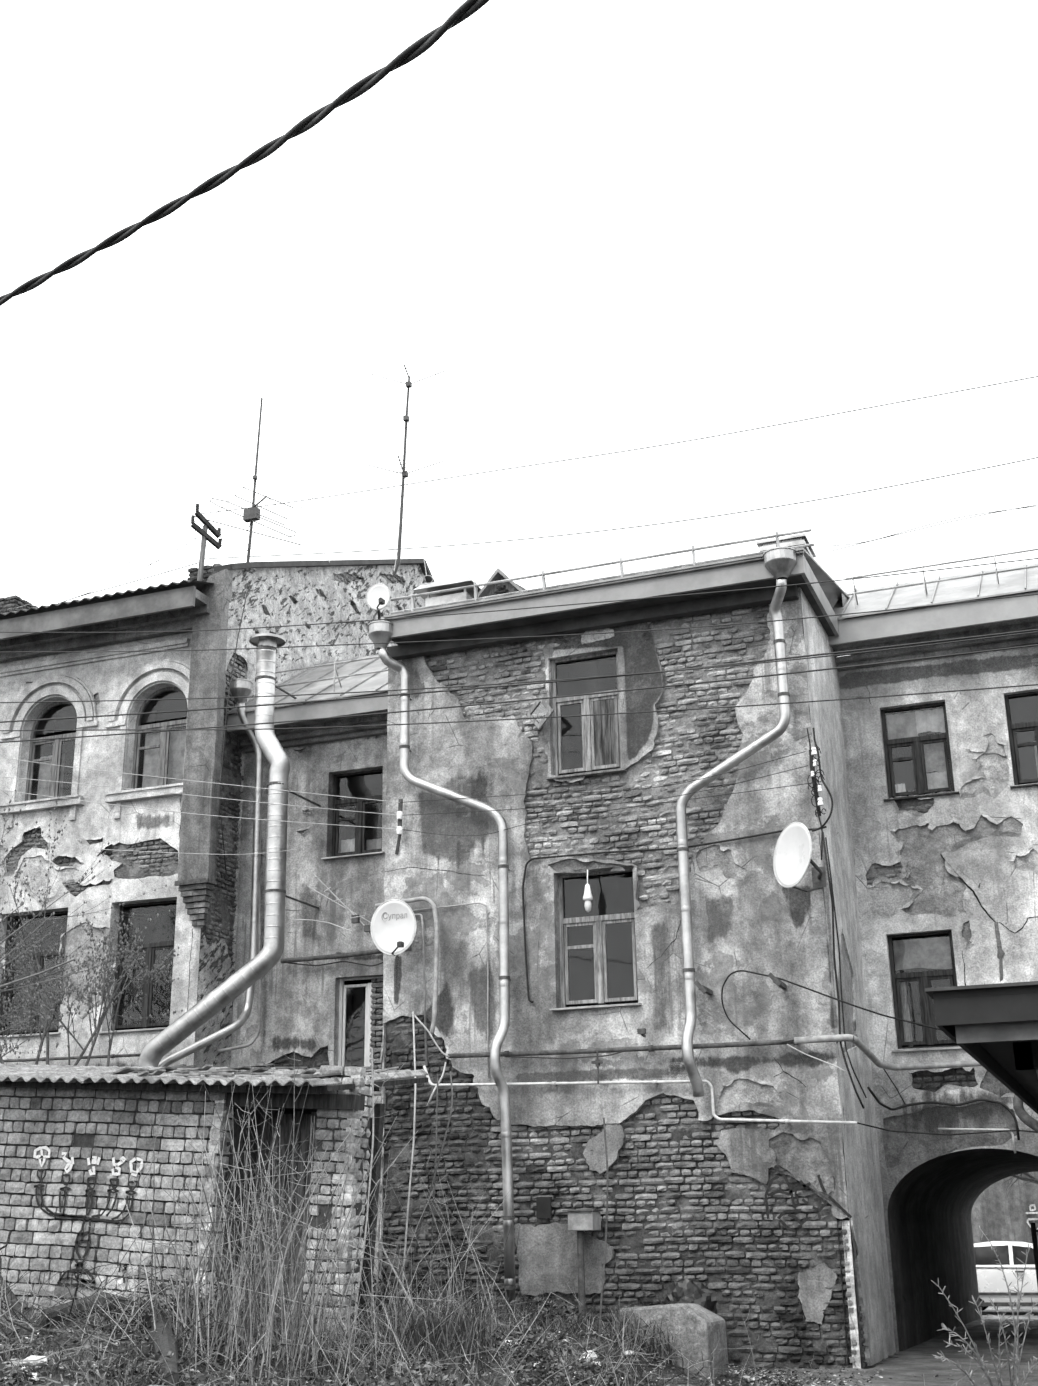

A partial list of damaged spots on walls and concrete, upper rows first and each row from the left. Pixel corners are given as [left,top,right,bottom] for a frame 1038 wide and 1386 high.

flaking render [425,604,773,910]
peeling [957,733,1010,799]
spalling [0,825,178,906]
peeling [866,796,1038,950]
spalling [265,1047,329,1069]
flaking render [377,1016,868,1369]